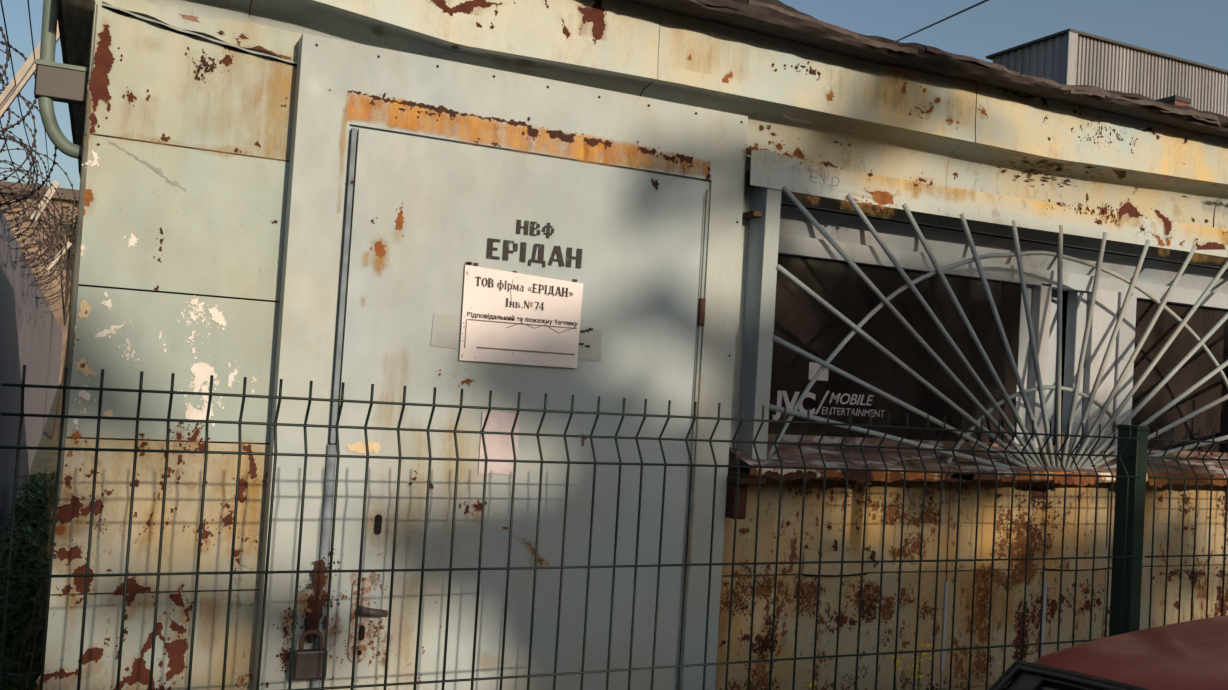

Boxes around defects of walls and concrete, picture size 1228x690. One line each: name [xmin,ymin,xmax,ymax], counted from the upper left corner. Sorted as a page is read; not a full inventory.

corrosion [347,90,711,191]
corrosion [1071,109,1160,154]
corrosion [997,158,1228,259]
peeling [74,291,140,429]
peeling [178,295,238,427]
corrosion [133,422,268,571]
corrosion [1149,466,1228,534]
corrosion [235,549,350,690]
corrosion [354,572,422,683]
corrosion [719,465,1110,690]
corrosion [1148,567,1228,617]